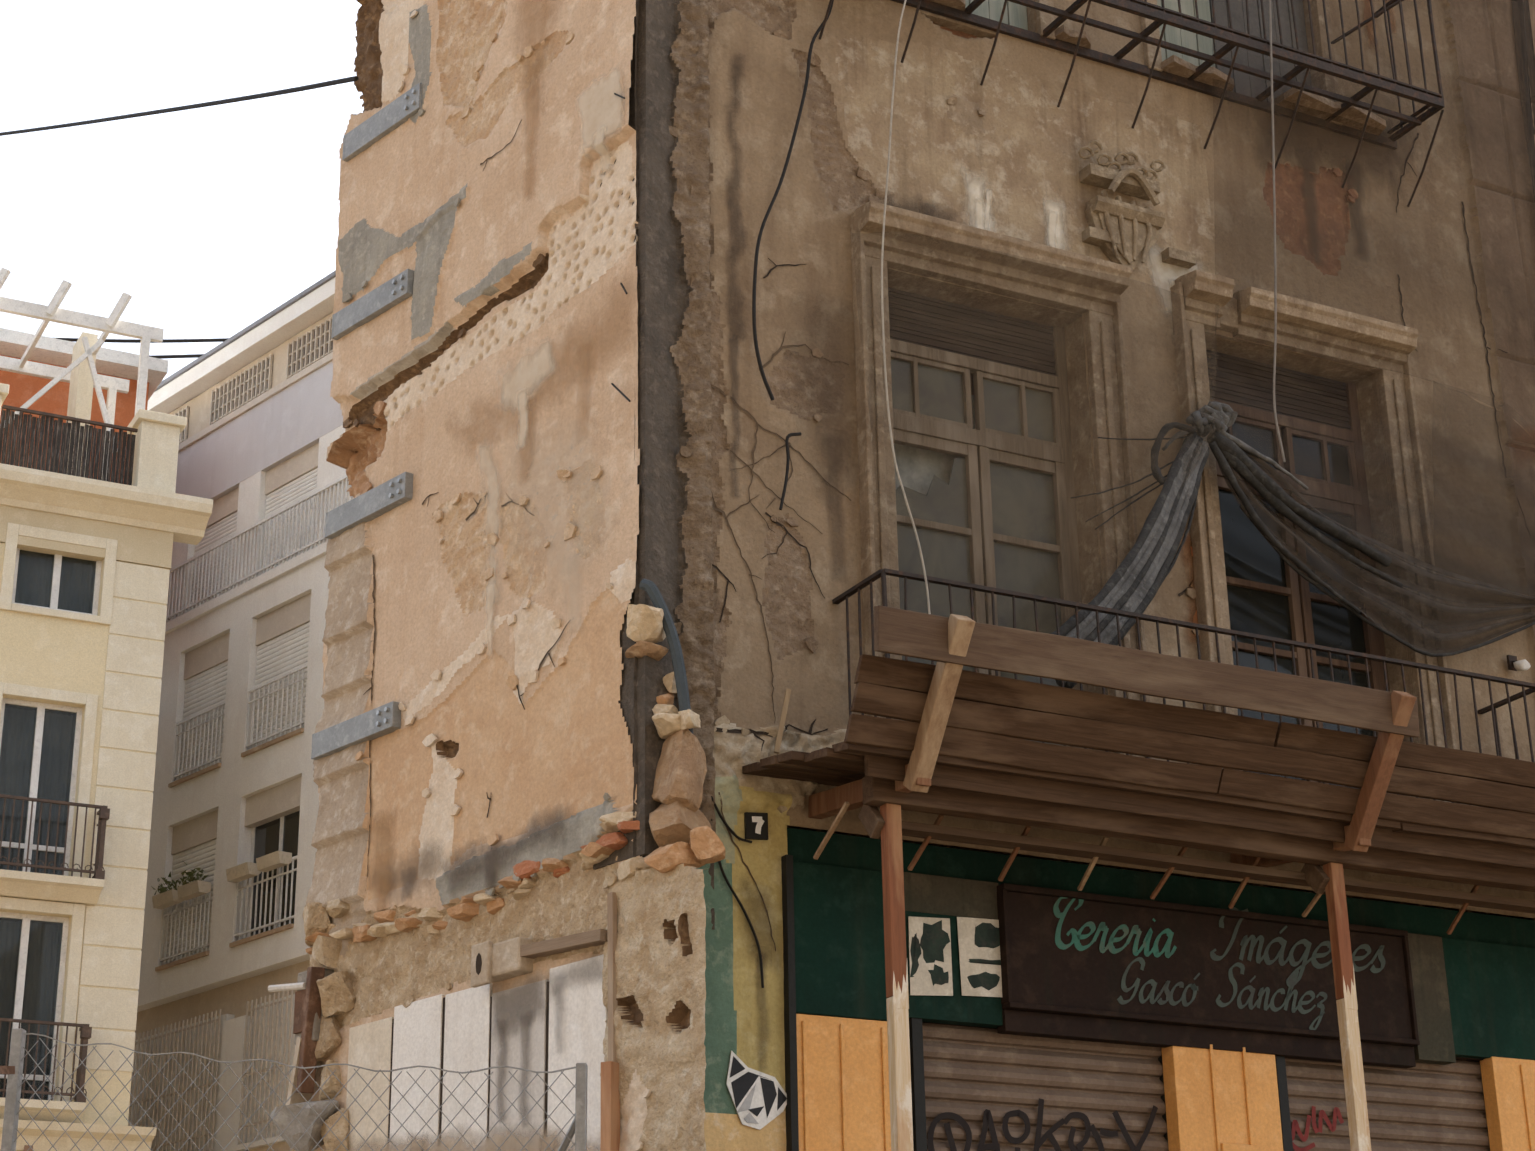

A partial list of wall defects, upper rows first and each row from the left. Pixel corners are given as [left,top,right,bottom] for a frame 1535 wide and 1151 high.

spalling [309,0,846,1028]
damp [729,64,743,496]